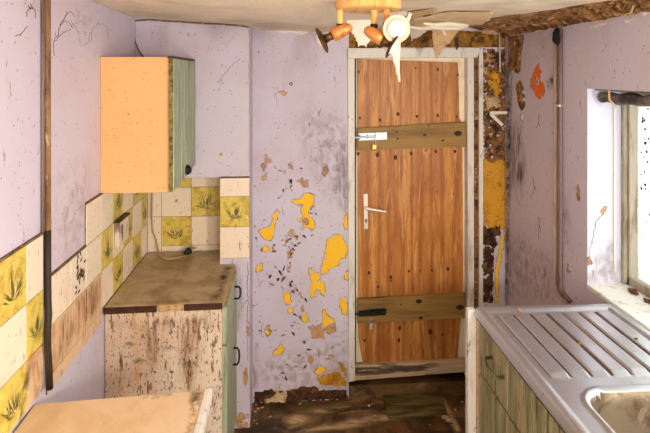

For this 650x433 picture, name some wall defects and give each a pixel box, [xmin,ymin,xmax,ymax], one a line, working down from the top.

crack [53,12,108,56]
flaking render [468,0,650,303]
flaking render [253,155,349,403]